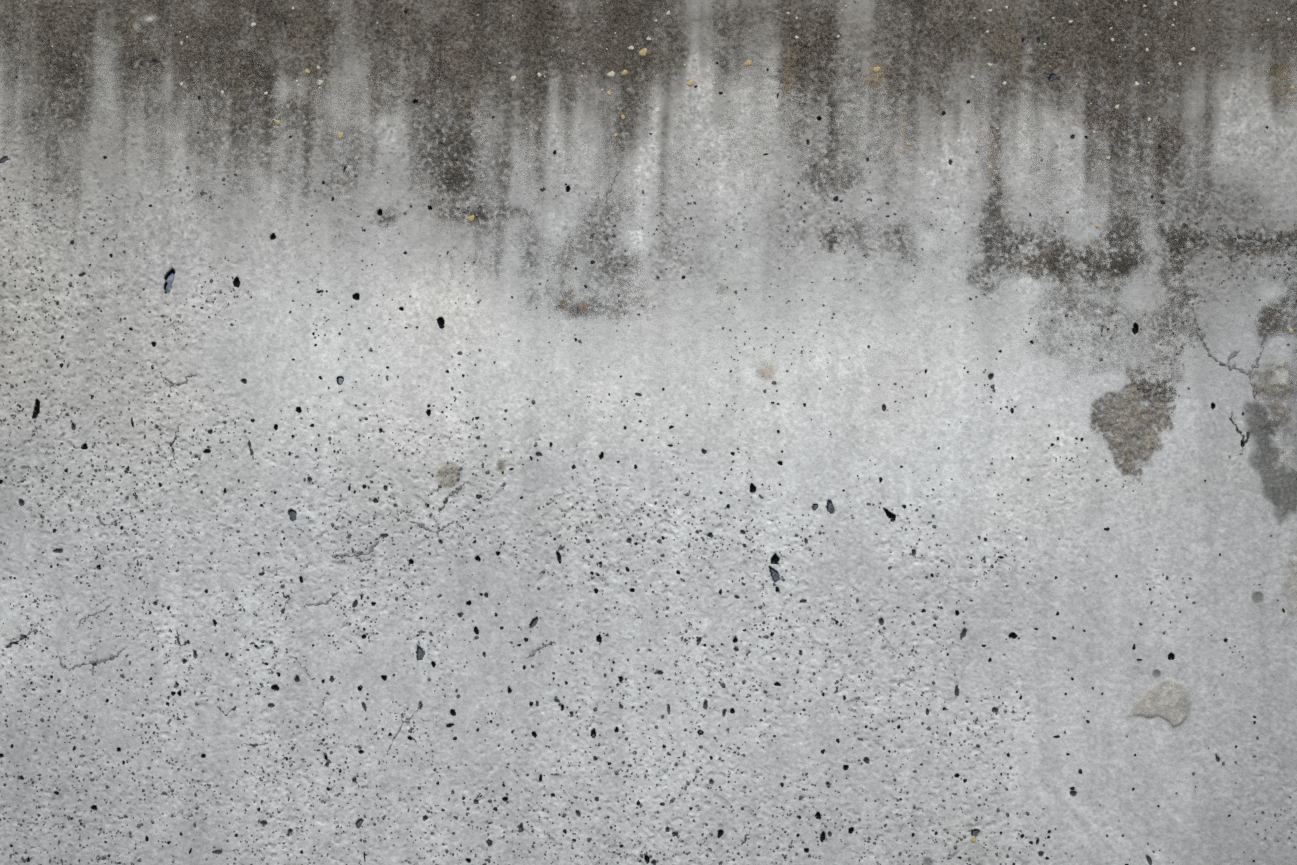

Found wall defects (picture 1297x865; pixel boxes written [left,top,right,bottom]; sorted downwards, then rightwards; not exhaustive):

leakage [0,0,1297,267]
leakage [975,208,1132,290]
leakage [1259,317,1275,340]
spalling [1091,371,1176,480]